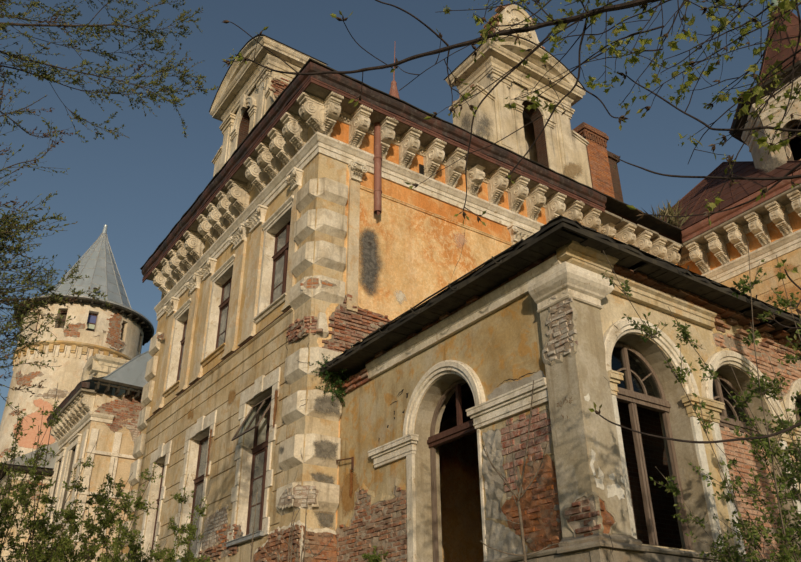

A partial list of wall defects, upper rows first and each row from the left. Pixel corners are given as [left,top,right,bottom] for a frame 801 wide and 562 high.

leakage [360,230,381,295]
flaking render [15,368,70,401]
flaking render [61,310,127,351]
flaking render [92,389,145,446]
flaking render [286,276,394,353]
flaking render [487,290,578,400]
flaking render [709,328,801,408]
flaking render [252,478,407,562]
flaking render [481,406,625,561]
flaking render [719,425,789,560]